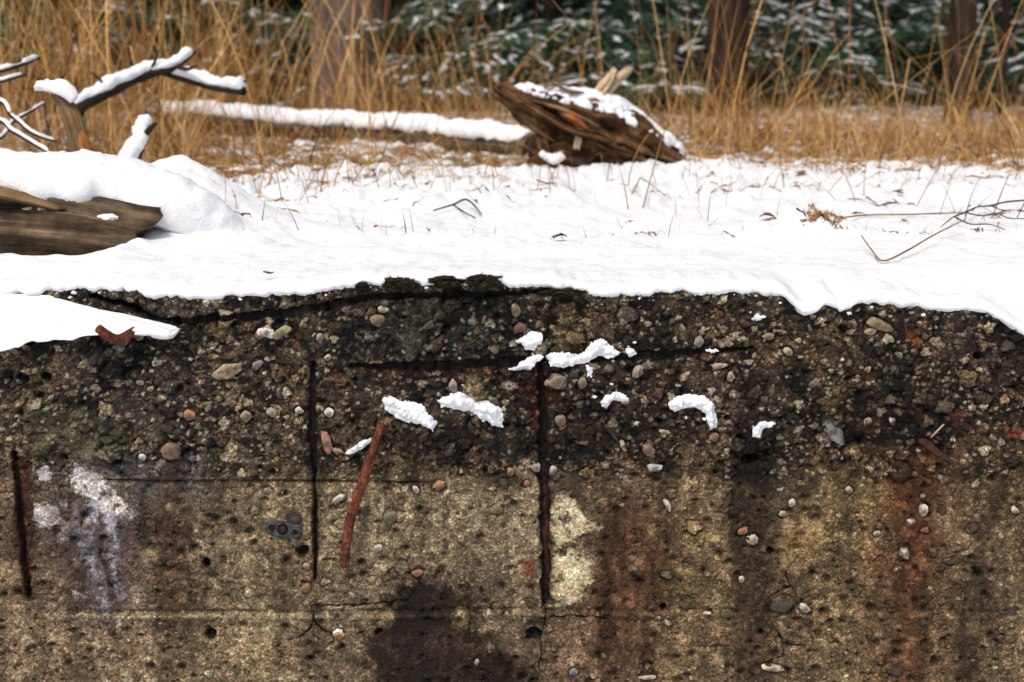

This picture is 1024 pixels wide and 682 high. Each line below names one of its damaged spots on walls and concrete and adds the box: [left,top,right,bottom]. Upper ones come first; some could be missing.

crack [589,346,751,362]
corrosion [9,455,35,602]
leakage [32,459,201,622]
crack [308,362,318,578]
corrosion [340,421,384,568]
crack [351,356,617,669]
corrosion [589,496,675,679]
leakage [728,371,782,682]
corrosion [881,437,954,682]